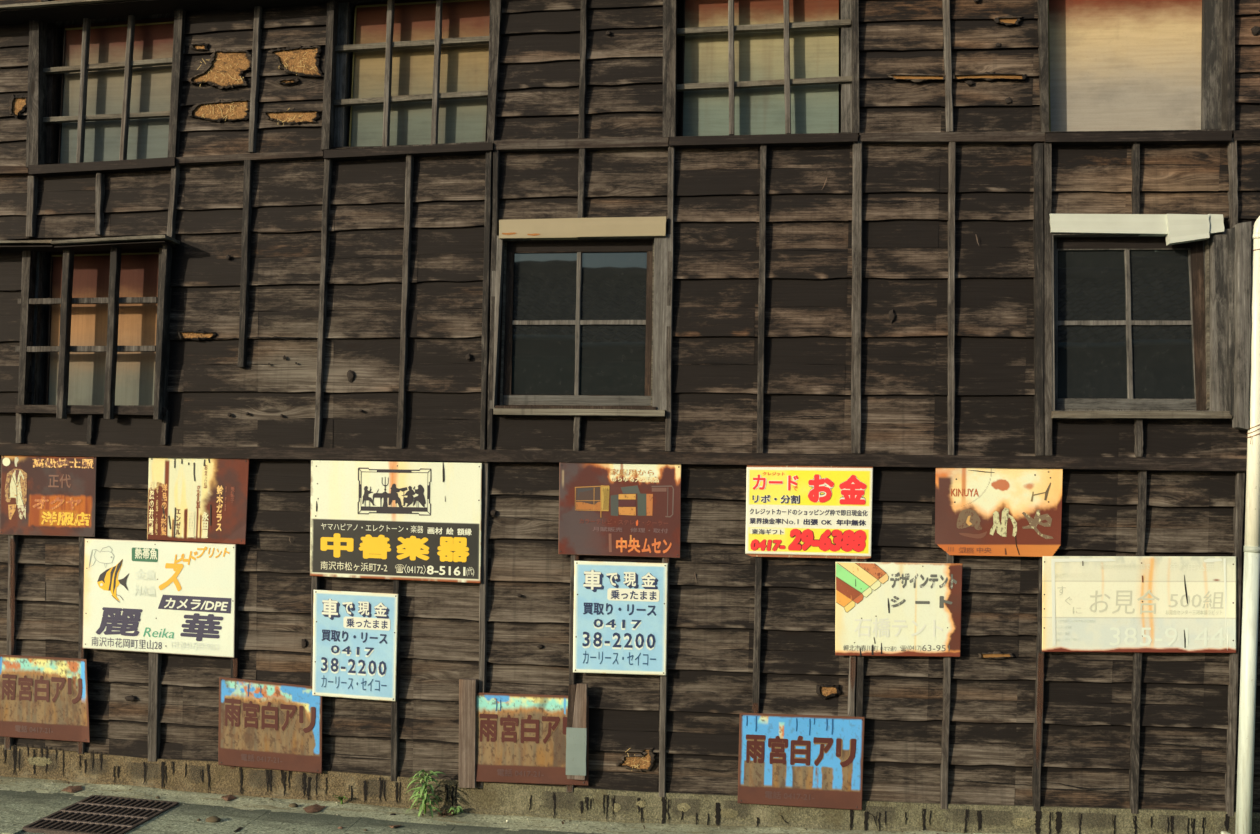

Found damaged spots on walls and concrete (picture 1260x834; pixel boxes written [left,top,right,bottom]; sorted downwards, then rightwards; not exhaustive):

leakage [3,743,64,776]
leakage [79,750,120,785]
leakage [143,761,210,792]
leakage [266,770,327,800]
leakage [349,778,401,804]
leakage [579,795,615,821]
leakage [661,797,721,826]
leakage [850,810,886,831]
leakage [964,809,982,834]
leakage [1035,811,1062,834]
leakage [1133,816,1206,834]